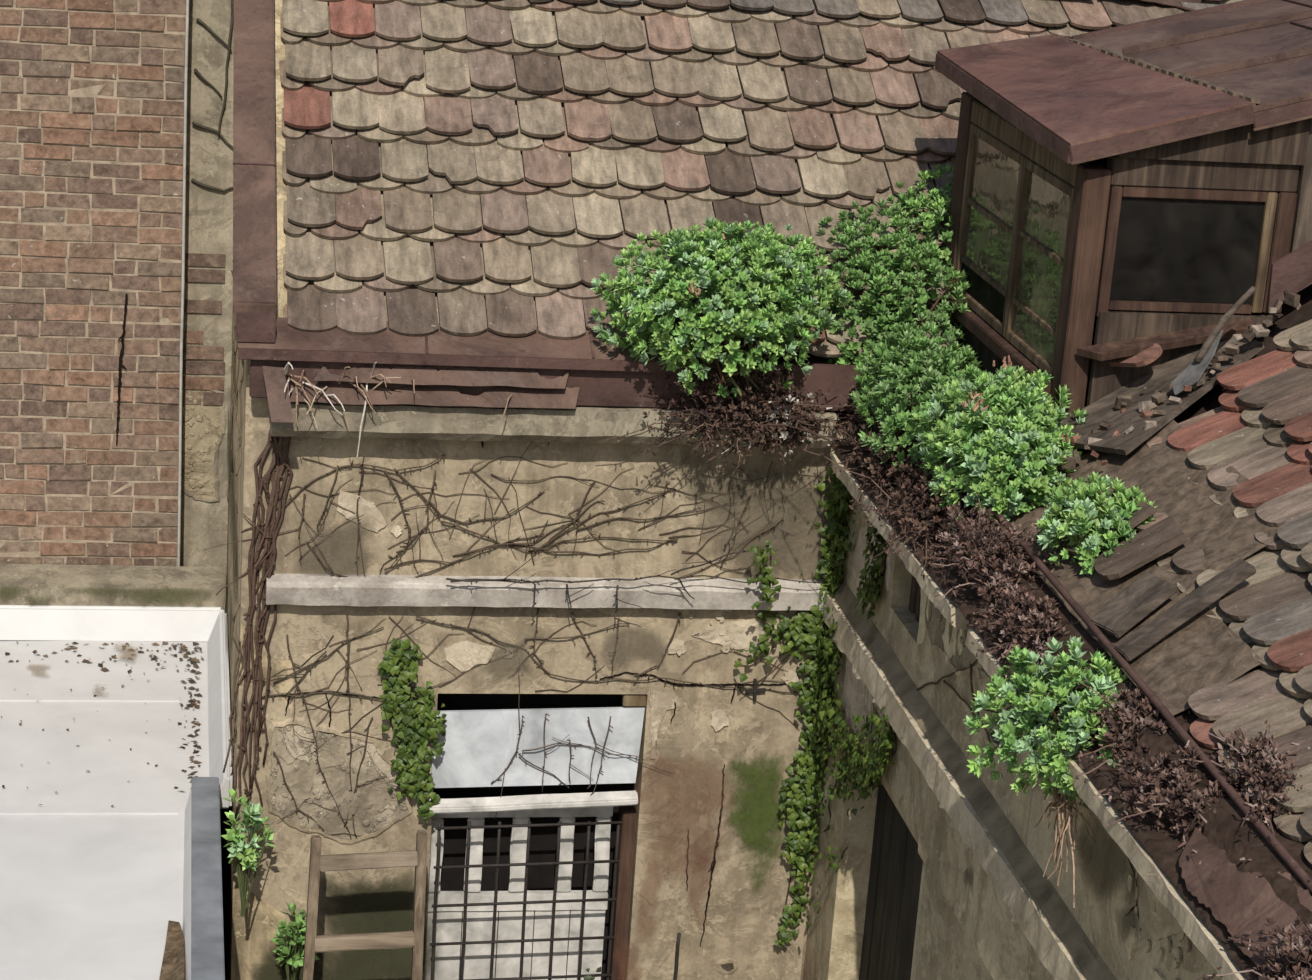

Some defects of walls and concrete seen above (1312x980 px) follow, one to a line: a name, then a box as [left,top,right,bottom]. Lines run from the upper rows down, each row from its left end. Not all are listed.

crack [116,293,128,445]
spalling [917,588,993,683]
spalling [988,726,1013,755]
spalling [714,958,738,976]
peeling [1126,871,1191,980]